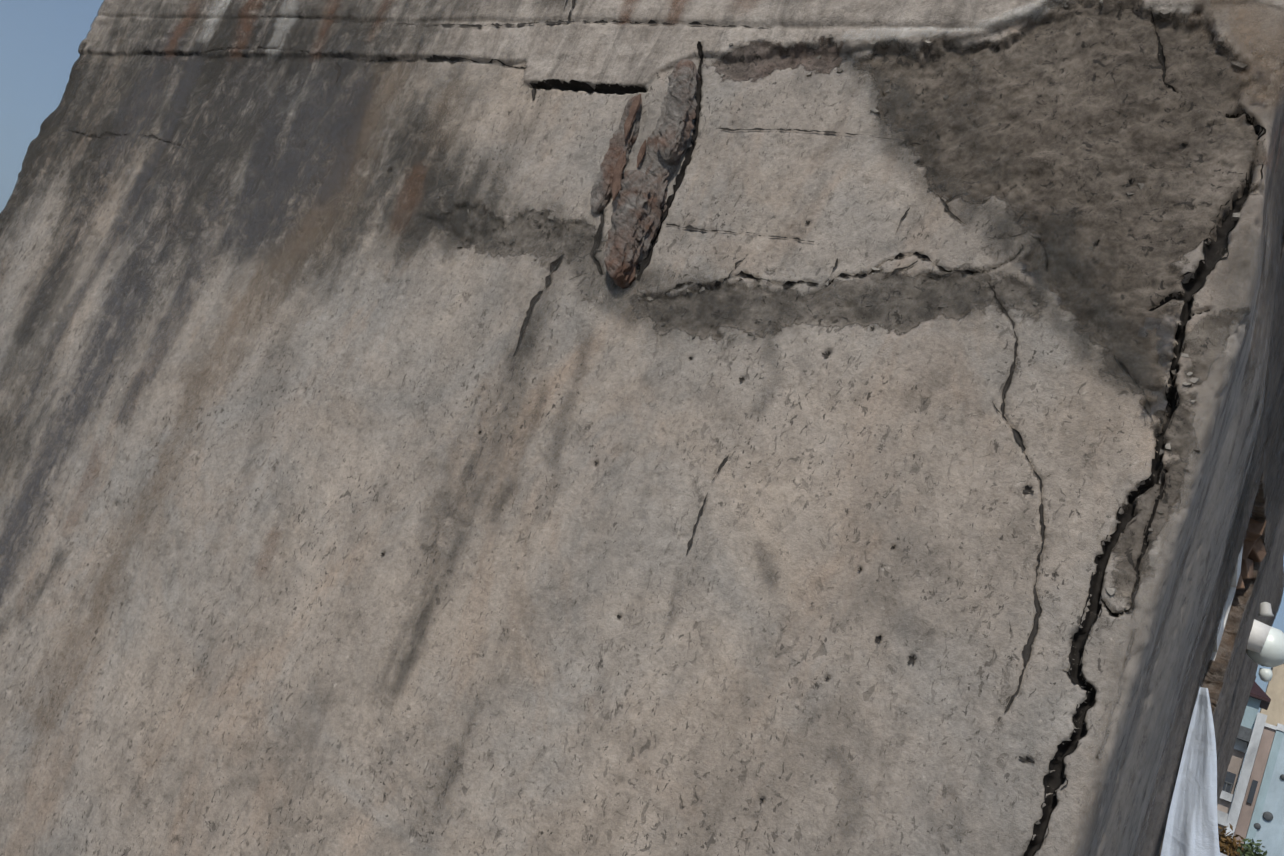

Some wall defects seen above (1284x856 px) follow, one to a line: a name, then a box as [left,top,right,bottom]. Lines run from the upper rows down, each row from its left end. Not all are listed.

damp [0,0,498,600]
crack [143,0,1051,713]
spalling [630,0,1284,605]
crack [1024,110,1266,856]
crack [1151,12,1176,92]